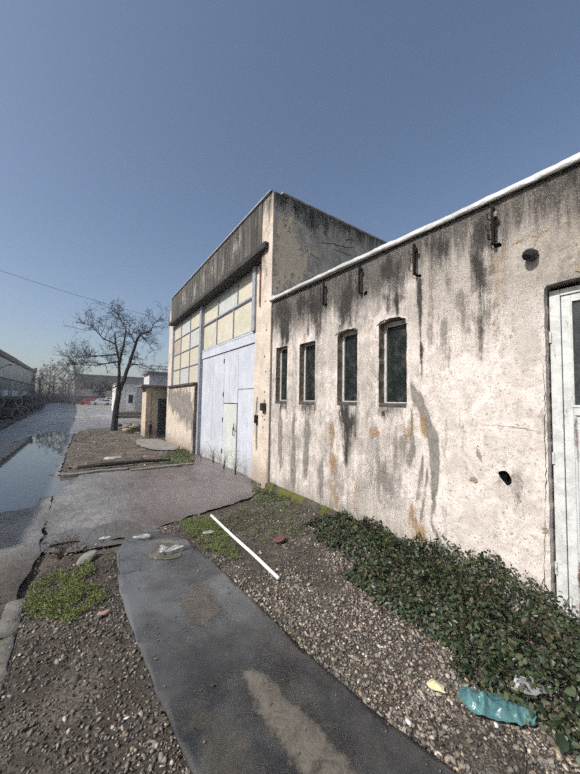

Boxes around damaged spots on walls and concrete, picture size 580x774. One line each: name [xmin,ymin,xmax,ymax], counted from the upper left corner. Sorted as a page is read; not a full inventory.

peeling [273,211,315,303]
water stain [470,214,489,297]
water stain [275,271,358,359]
water stain [417,277,450,373]
water stain [456,290,487,351]
water stain [278,403,315,490]
water stain [340,405,356,466]
water stain [360,462,399,528]
water stain [394,382,441,546]